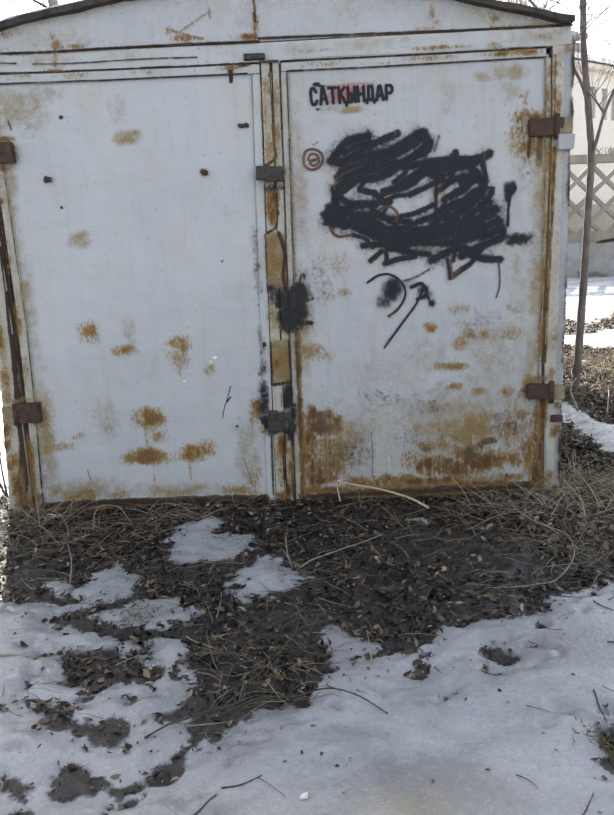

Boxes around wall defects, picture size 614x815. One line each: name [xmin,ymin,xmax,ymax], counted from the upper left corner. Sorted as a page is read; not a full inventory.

rust [166,8,211,43]
rust [0,34,575,516]